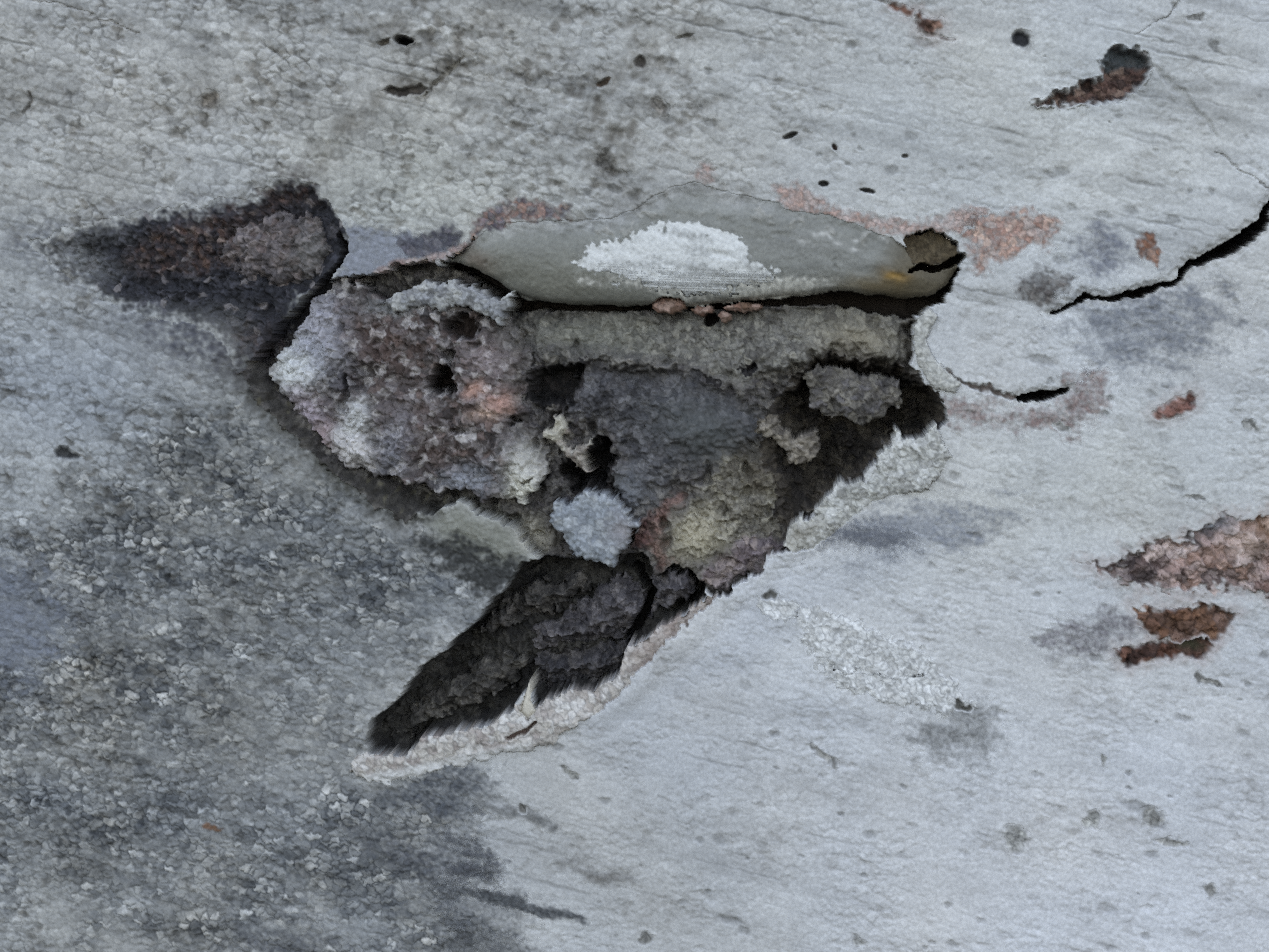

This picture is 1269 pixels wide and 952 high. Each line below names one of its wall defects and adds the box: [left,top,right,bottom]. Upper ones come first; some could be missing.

hole [1029,44,1154,111]
efflorescence [571,220,832,307]
crack [1050,151,1269,315]
crack [941,364,1070,403]
spalling [28,176,977,787]
rust [1076,511,1269,670]